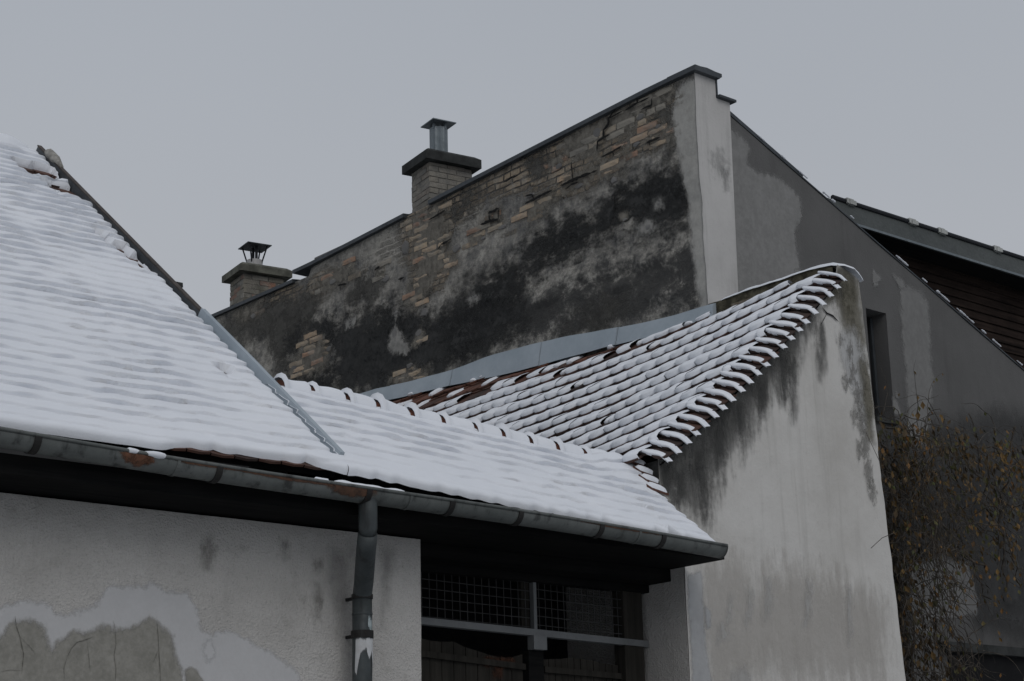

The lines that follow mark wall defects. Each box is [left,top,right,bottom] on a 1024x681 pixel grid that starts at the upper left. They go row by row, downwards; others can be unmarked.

spalling [372,84,682,348]
corrosion [121,452,155,467]
spalling [389,363,428,385]
leakage [659,313,826,520]
flaking render [0,582,301,681]